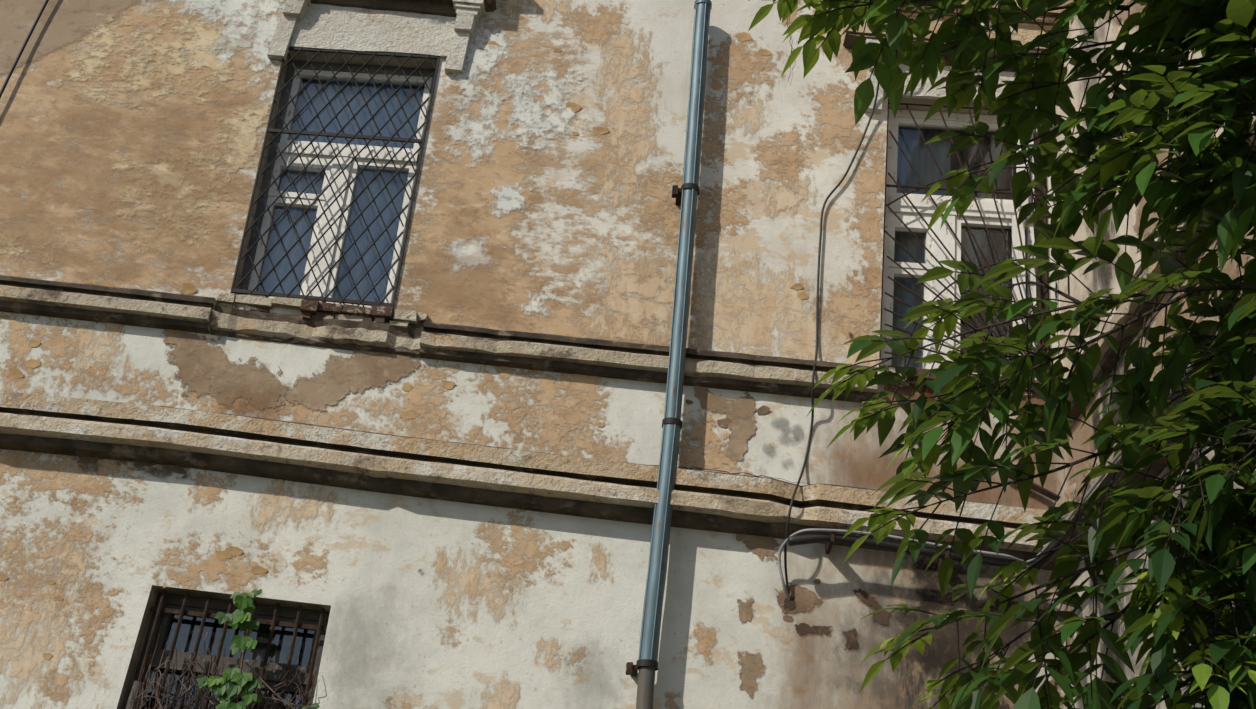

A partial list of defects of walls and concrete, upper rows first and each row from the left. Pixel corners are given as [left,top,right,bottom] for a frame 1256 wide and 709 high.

peeling [0,0,286,305]
peeling [393,0,683,346]
peeling [686,28,887,366]
water stain [1094,187,1113,241]
spalling [1133,196,1159,254]
spalling [1155,139,1183,182]
peeling [0,314,634,463]
peeling [0,449,147,709]
peeling [433,510,575,647]
peeling [737,597,754,623]
peeling [738,651,766,698]
water stain [858,549,1118,709]